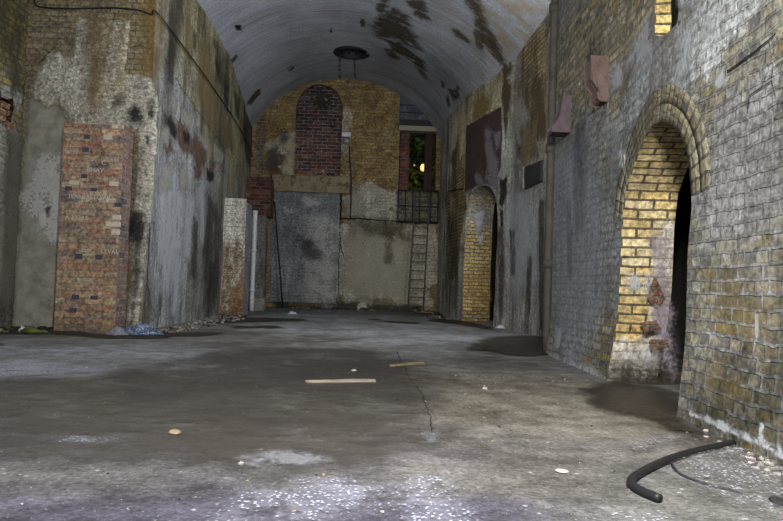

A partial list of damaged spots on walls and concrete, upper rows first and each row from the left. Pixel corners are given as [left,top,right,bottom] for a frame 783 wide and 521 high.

peeling [31,18,215,327]
water stain [126,243,140,295]
water stain [153,158,219,316]
water stain [428,189,783,511]